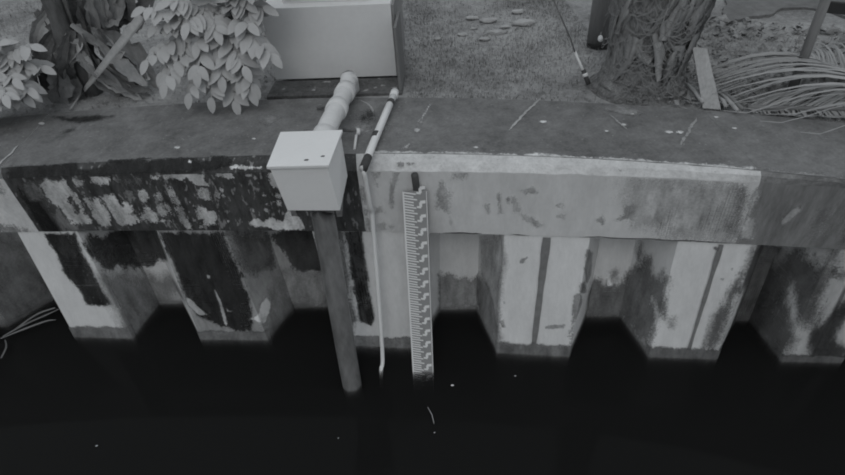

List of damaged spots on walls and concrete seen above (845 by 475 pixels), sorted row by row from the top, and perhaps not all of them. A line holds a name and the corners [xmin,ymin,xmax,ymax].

peeling [19,174,225,232]
spalling [216,164,305,231]
water stain [0,224,52,322]
water stain [586,179,845,375]